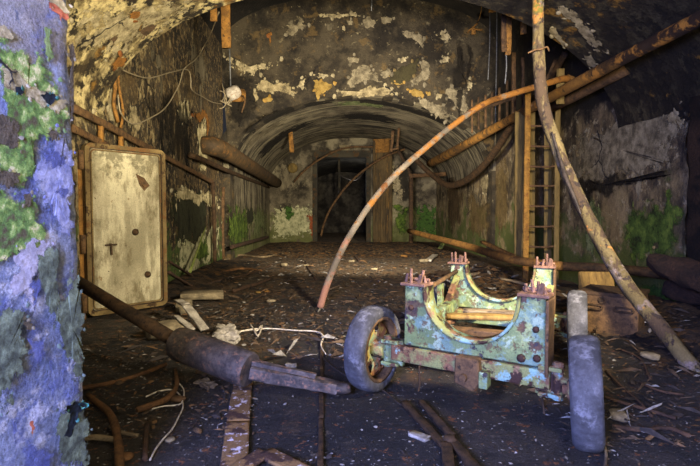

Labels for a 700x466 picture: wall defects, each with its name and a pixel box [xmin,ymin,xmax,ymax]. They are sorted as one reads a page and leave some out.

spalling [284,18,311,37]
spalling [318,10,395,32]
spalling [402,31,426,48]
peeling [548,26,568,49]
peeling [556,5,609,69]
peeling [177,38,208,171]
spalling [223,53,472,125]
peeling [0,0,192,416]
peeling [267,204,313,239]